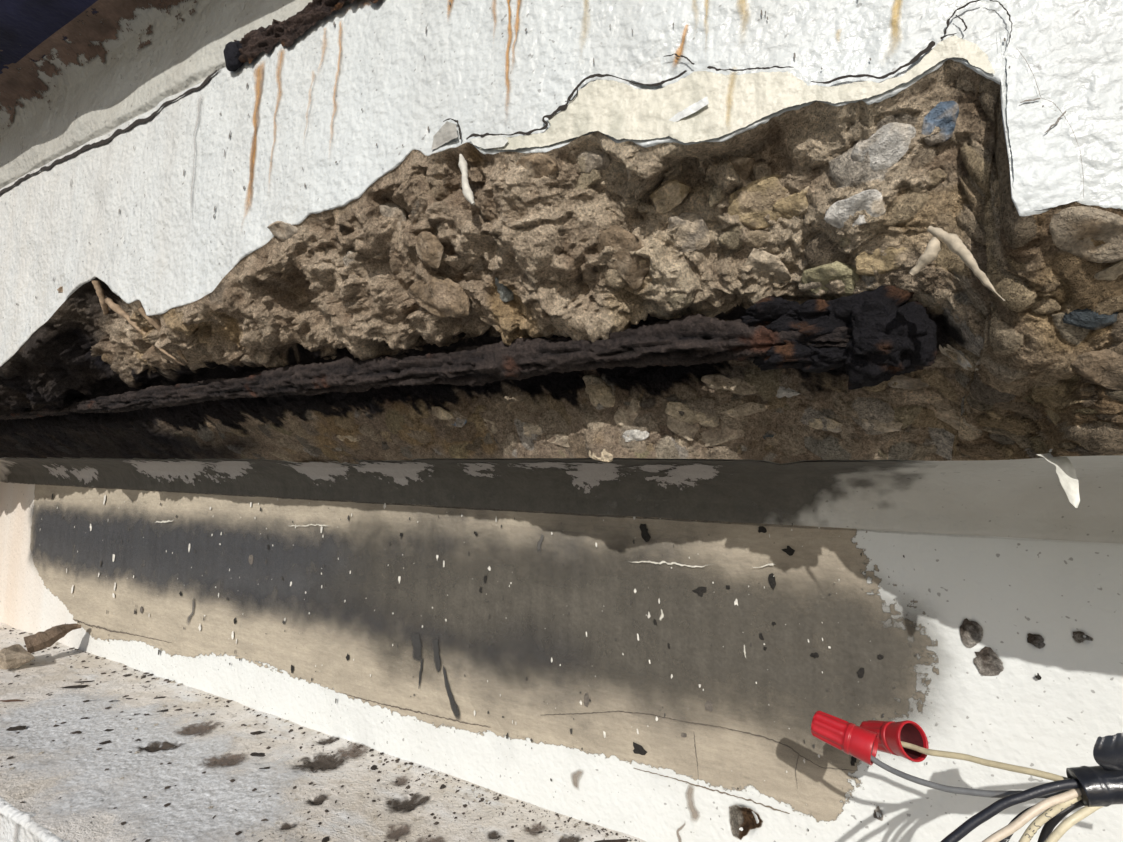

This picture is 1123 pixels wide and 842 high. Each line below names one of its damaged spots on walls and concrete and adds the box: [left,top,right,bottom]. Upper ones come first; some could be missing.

corrosion [223,0,354,200]
corrosion [494,0,521,90]
crack [443,0,1084,198]
spalling [0,35,1123,508]
corrosion [740,285,937,390]
leakage [30,508,927,740]
leakage [0,694,299,842]